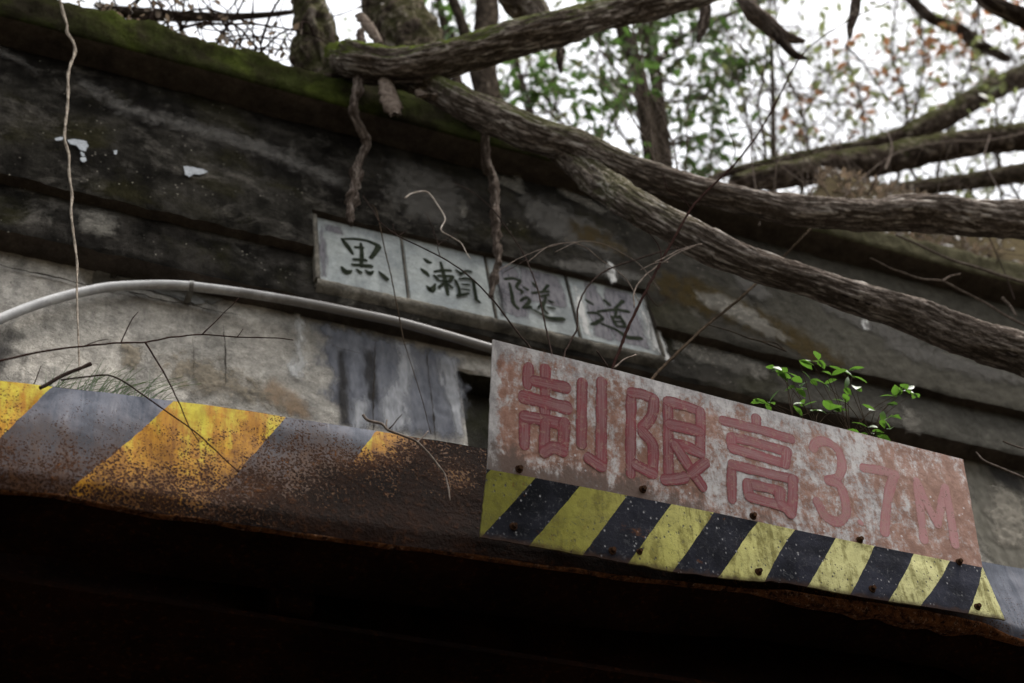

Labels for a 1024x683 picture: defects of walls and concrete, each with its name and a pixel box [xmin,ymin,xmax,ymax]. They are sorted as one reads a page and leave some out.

water stain [79,81,342,184]
water stain [80,211,116,235]
water stain [288,314,468,439]